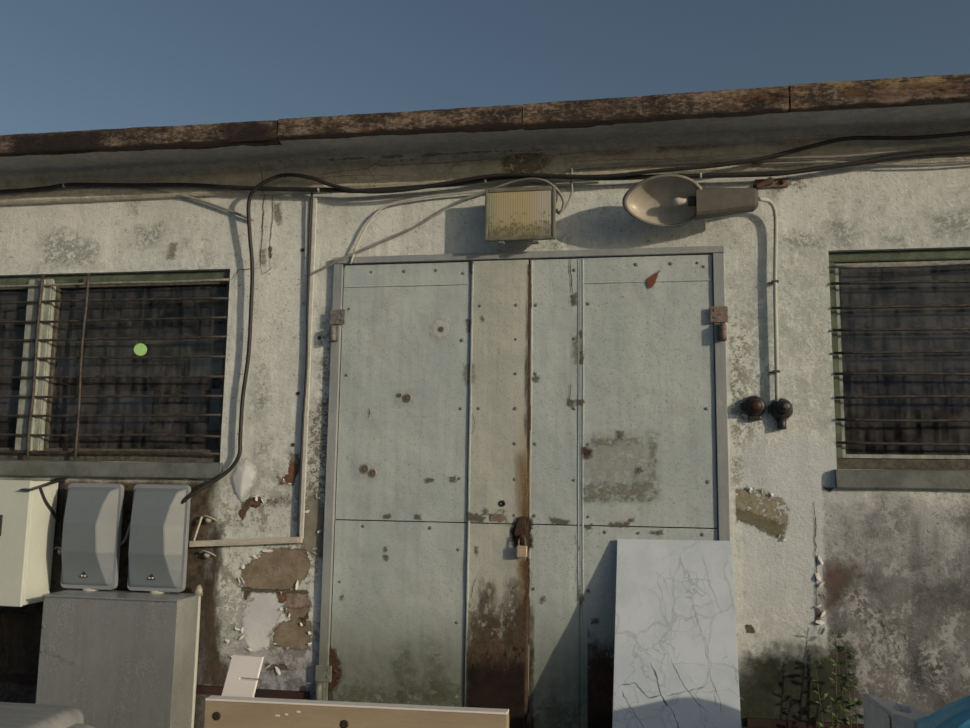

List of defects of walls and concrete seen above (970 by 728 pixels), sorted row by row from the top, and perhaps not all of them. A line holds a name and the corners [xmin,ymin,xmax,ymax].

leakage [15,131,100,154]
rust [647,270,660,288]
spalling [217,396,329,669]
rust [466,264,534,728]
peeling [736,486,790,541]
leakage [0,608,74,675]
peeling [265,663,289,675]
rust [587,633,614,728]
leakage [843,587,905,670]
leakage [920,646,951,696]